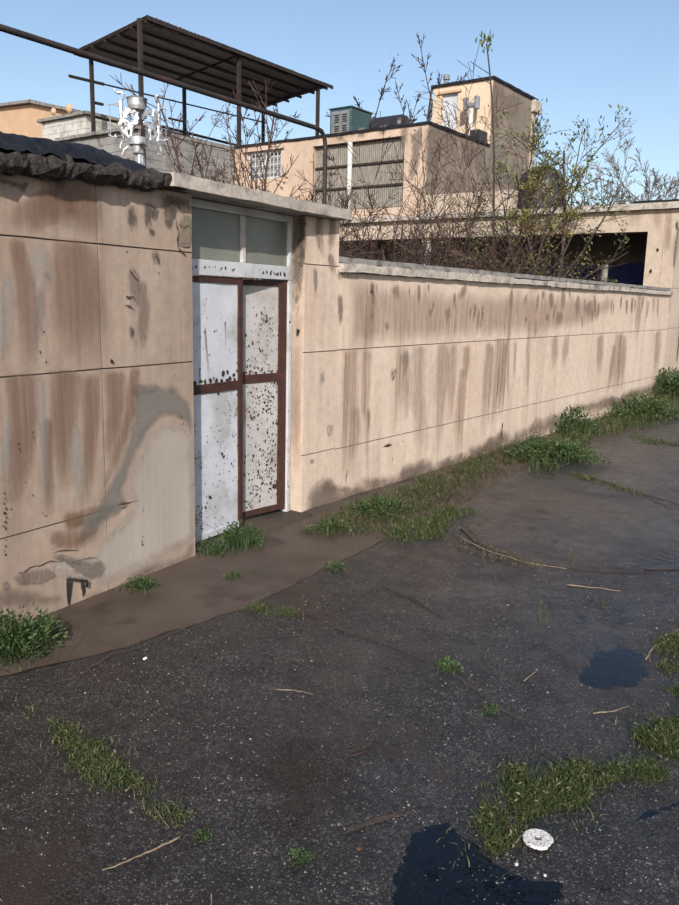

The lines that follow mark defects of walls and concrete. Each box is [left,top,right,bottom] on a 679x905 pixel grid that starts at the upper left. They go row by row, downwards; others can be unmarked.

damp [5,373,73,477]
damp [58,375,192,606]